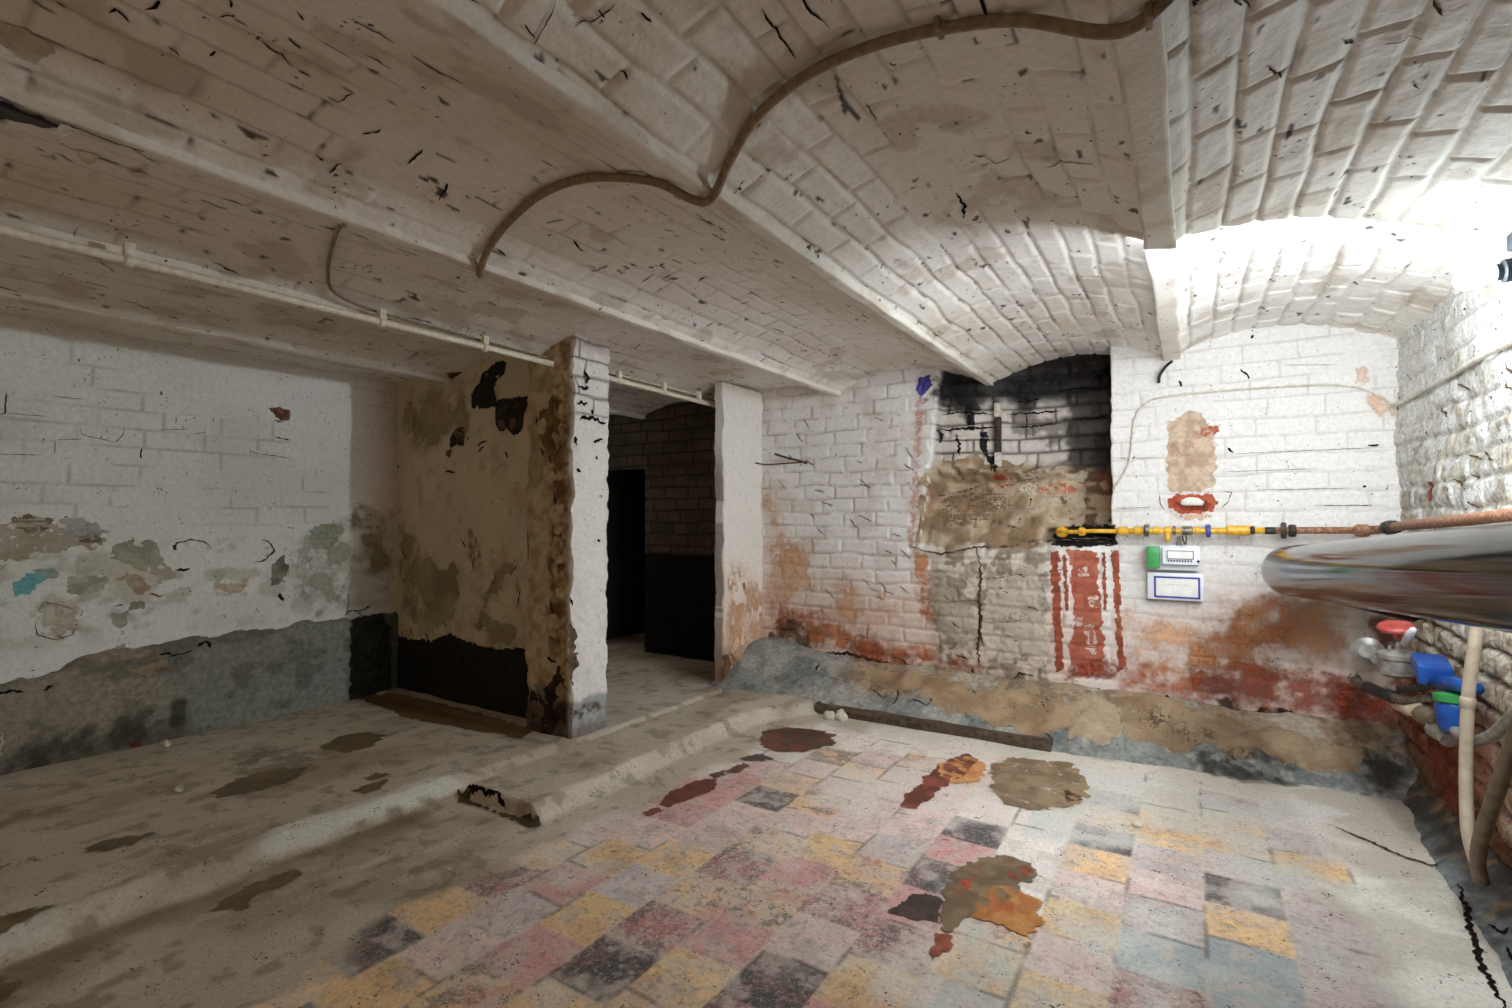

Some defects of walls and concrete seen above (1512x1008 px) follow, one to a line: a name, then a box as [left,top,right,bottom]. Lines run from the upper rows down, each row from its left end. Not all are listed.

spalling [446,396,528,474]
peeling [1165,410,1234,520]
water stain [35,602,79,640]
peeling [0,513,212,649]
peeling [256,539,289,601]
peeling [410,530,480,638]
peeling [474,558,521,646]
spalling [529,597,579,735]
spalling [857,413,1127,737]
water stain [0,699,187,770]
water stain [209,732,388,798]
crack [1336,827,1512,1008]